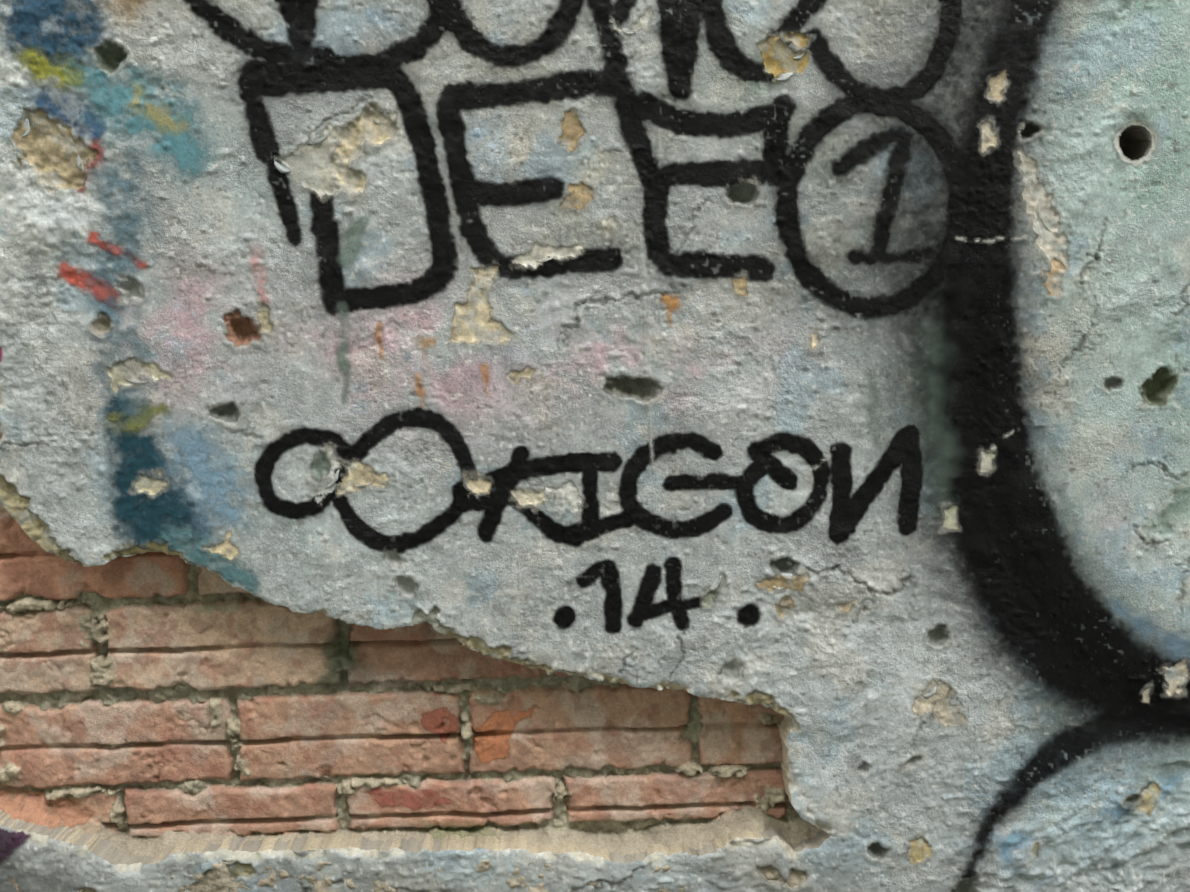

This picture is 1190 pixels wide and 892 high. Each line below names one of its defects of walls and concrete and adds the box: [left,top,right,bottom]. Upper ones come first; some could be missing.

peeling [12,109,98,194]
peeling [512,242,583,269]
spalling [224,302,273,347]
spalling [602,376,662,404]
spalling [209,403,240,423]
peeling [0,474,82,564]
peeling [135,471,167,495]
peeling [309,445,390,503]
peeling [466,472,491,494]
peeling [511,480,582,517]
peeling [755,558,810,618]
peeling [392,577,578,675]